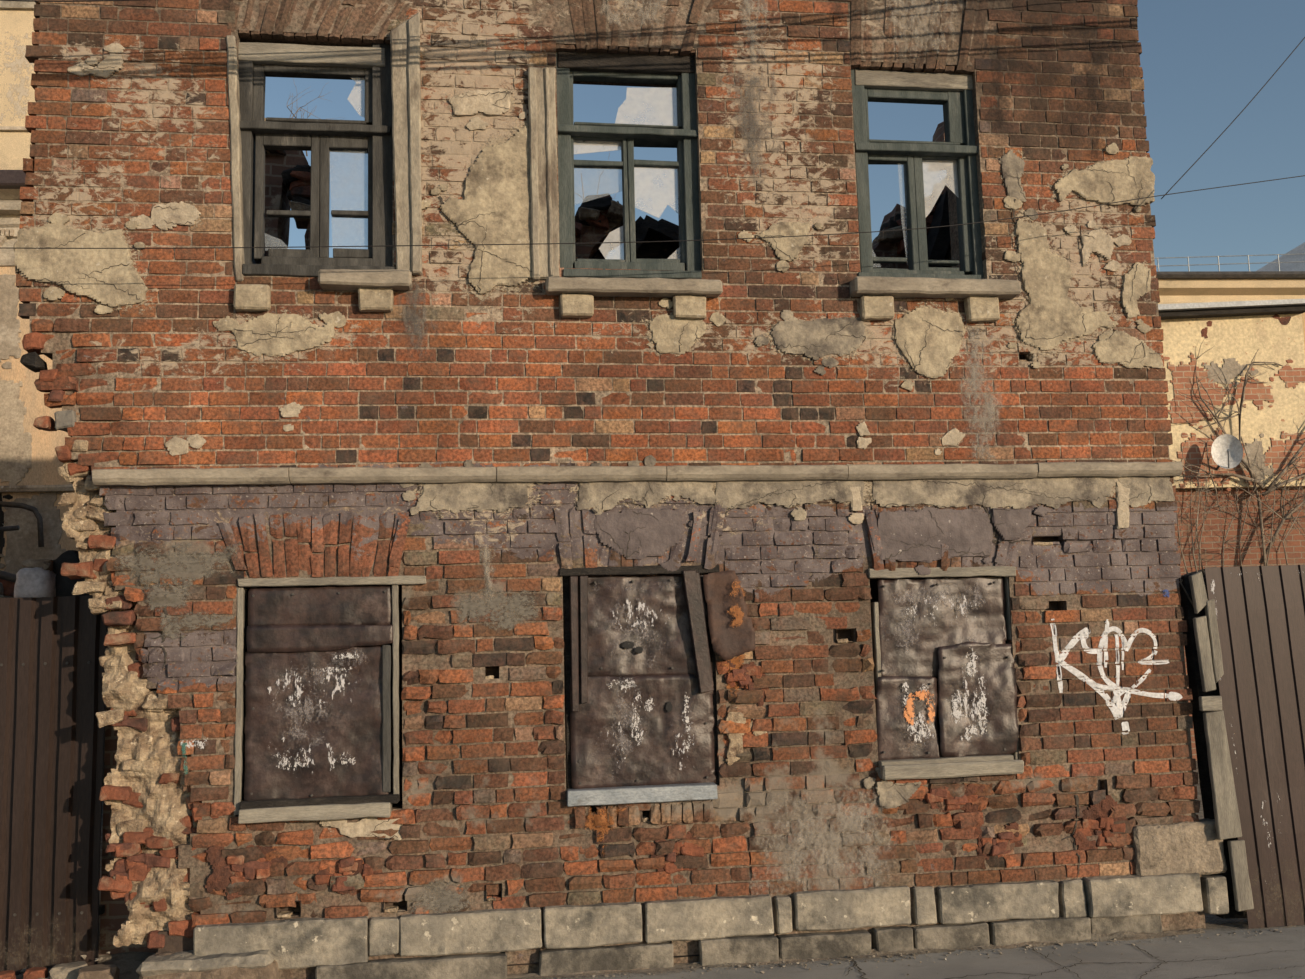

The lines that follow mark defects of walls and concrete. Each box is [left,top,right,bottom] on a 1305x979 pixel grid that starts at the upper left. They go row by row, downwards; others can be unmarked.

peeling [1104,143,1119,155]
peeling [125,214,154,250]
crack [427,196,532,291]
peeling [1103,234,1132,272]
peeling [213,316,239,331]
peeling [319,311,347,328]
spalling [1272,314,1291,325]
flaking render [0,273,116,580]
peeling [569,352,1305,575]
peeling [399,460,544,519]
spalling [101,595,148,679]
spalling [110,708,148,732]